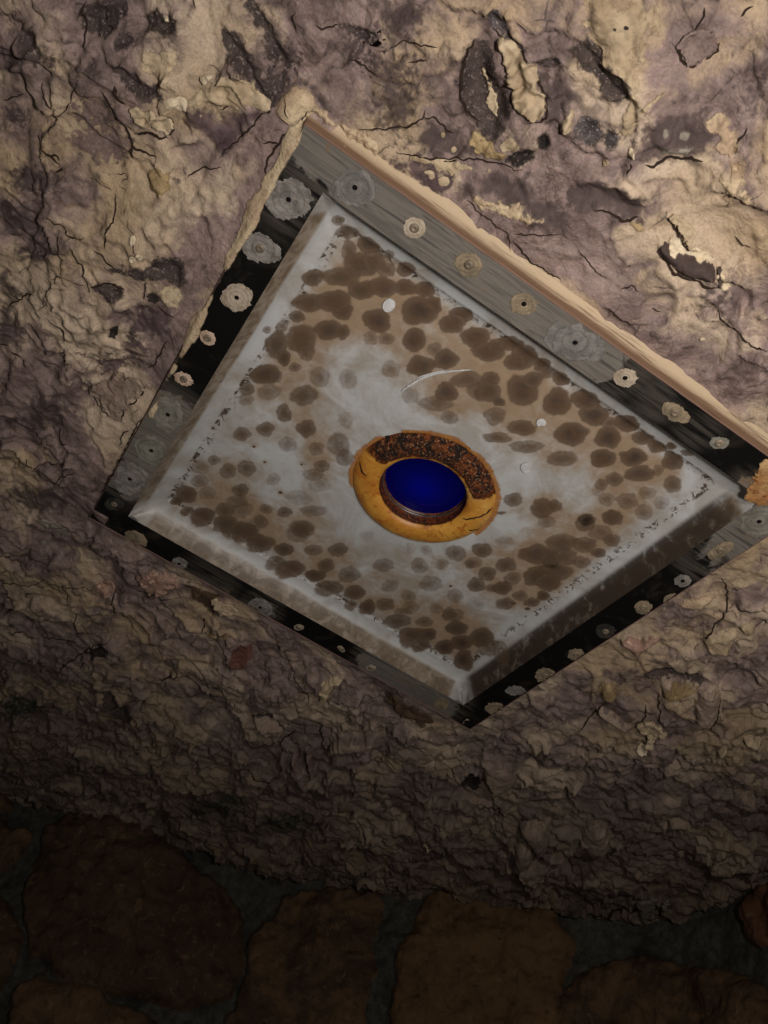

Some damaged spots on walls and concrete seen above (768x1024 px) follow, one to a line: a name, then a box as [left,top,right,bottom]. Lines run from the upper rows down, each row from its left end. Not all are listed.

crack [3,80,175,341]
crack [188,100,307,177]
peeling [410,132,474,186]
crack [359,29,549,171]
spalling [455,9,562,173]
crack [626,155,703,175]
peeling [669,214,731,290]
crack [660,217,767,352]
damp [701,282,741,316]
damp [236,216,692,610]
corrosion [349,430,501,535]
damp [170,458,505,671]